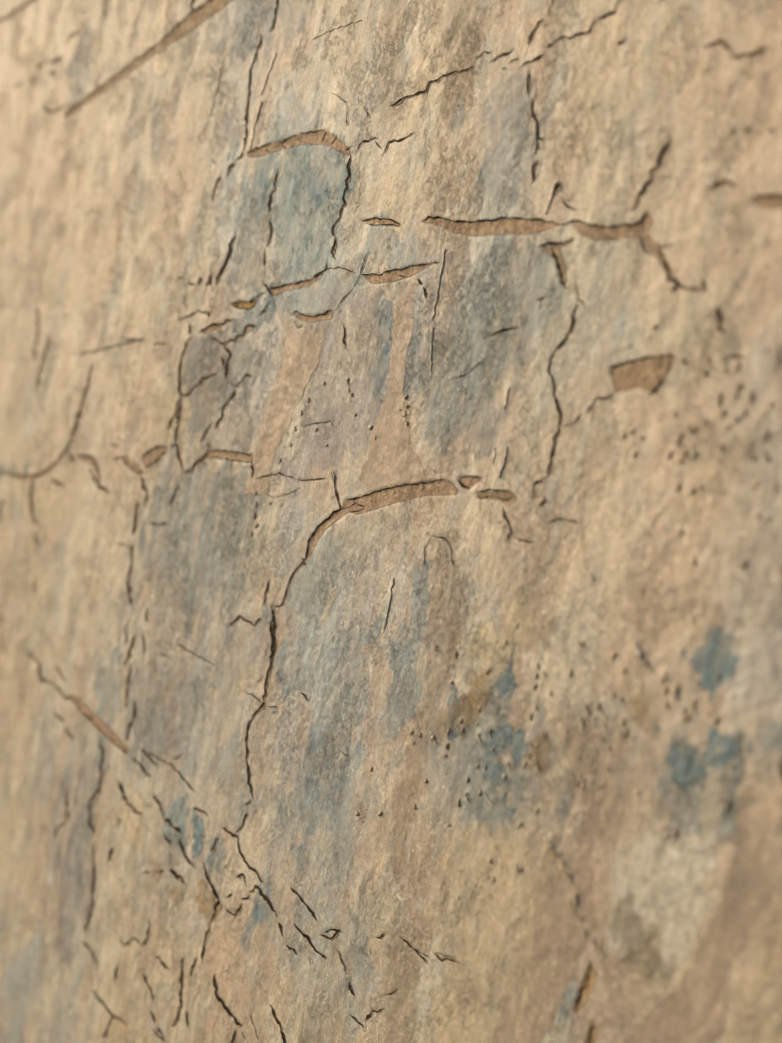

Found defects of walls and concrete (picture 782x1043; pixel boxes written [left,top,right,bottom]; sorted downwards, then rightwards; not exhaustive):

crack [390,0,781,543]
flaking render [586,354,675,413]
crack [0,0,438,1043]
crack [424,535,454,570]
crack [375,933,460,964]
crack [574,962,597,1043]